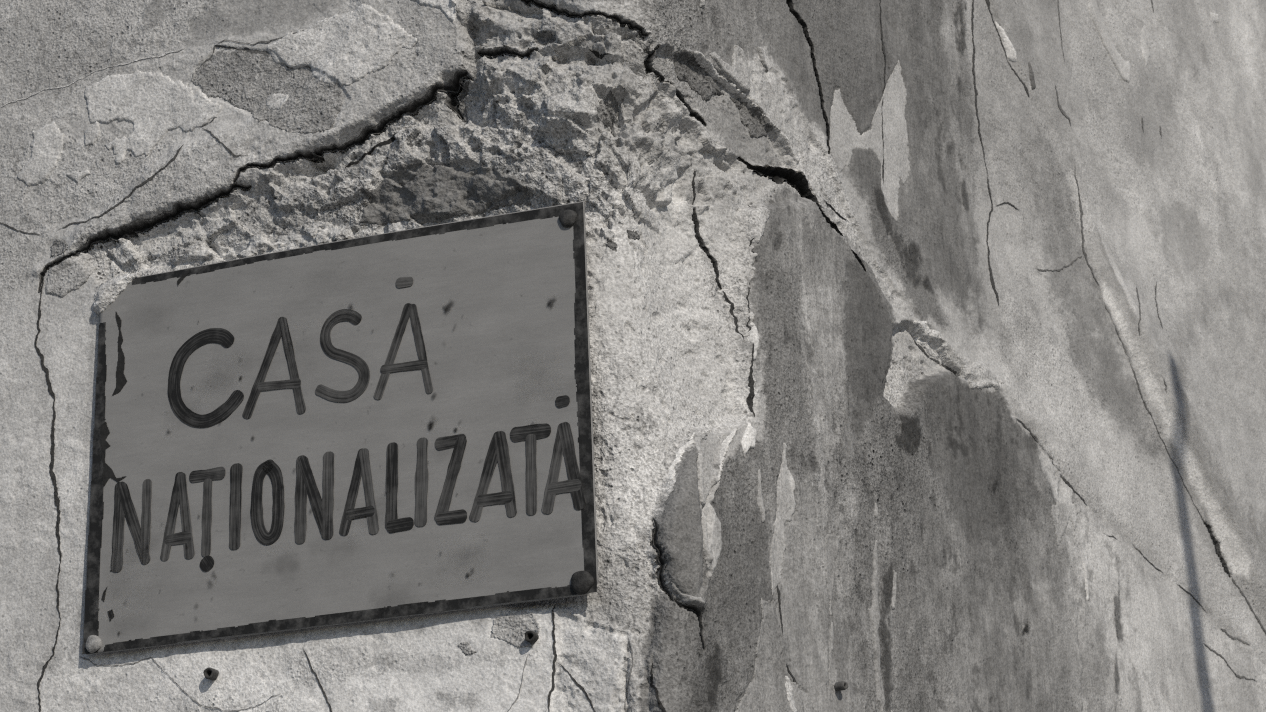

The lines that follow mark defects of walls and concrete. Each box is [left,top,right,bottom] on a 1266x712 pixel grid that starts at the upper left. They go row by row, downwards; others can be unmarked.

flaking render [84,4,417,164]
crack [523,0,707,126]
spalling [673,45,800,164]
flaking render [829,60,911,221]
damp [954,3,966,55]
crack [691,163,755,417]
crack [738,157,866,271]
damp [876,190,932,289]
crack [0,46,539,712]
flaking render [668,422,757,579]
damp [881,563,894,706]
damp [1114,590,1122,639]